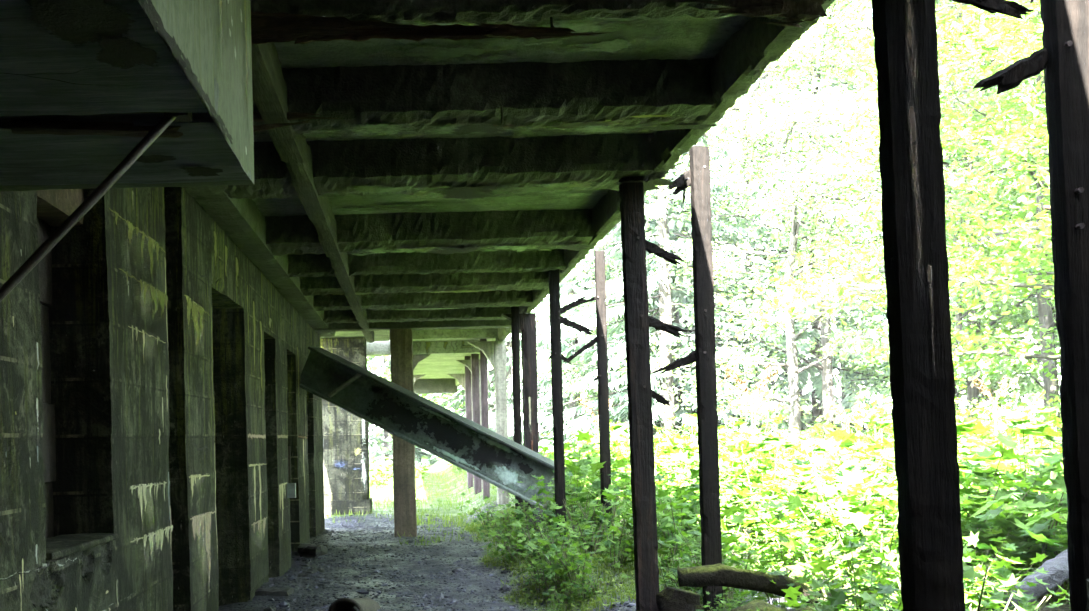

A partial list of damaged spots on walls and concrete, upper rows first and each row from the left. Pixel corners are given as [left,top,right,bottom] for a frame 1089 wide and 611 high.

water stain [130,472,173,555]
water stain [189,471,218,584]